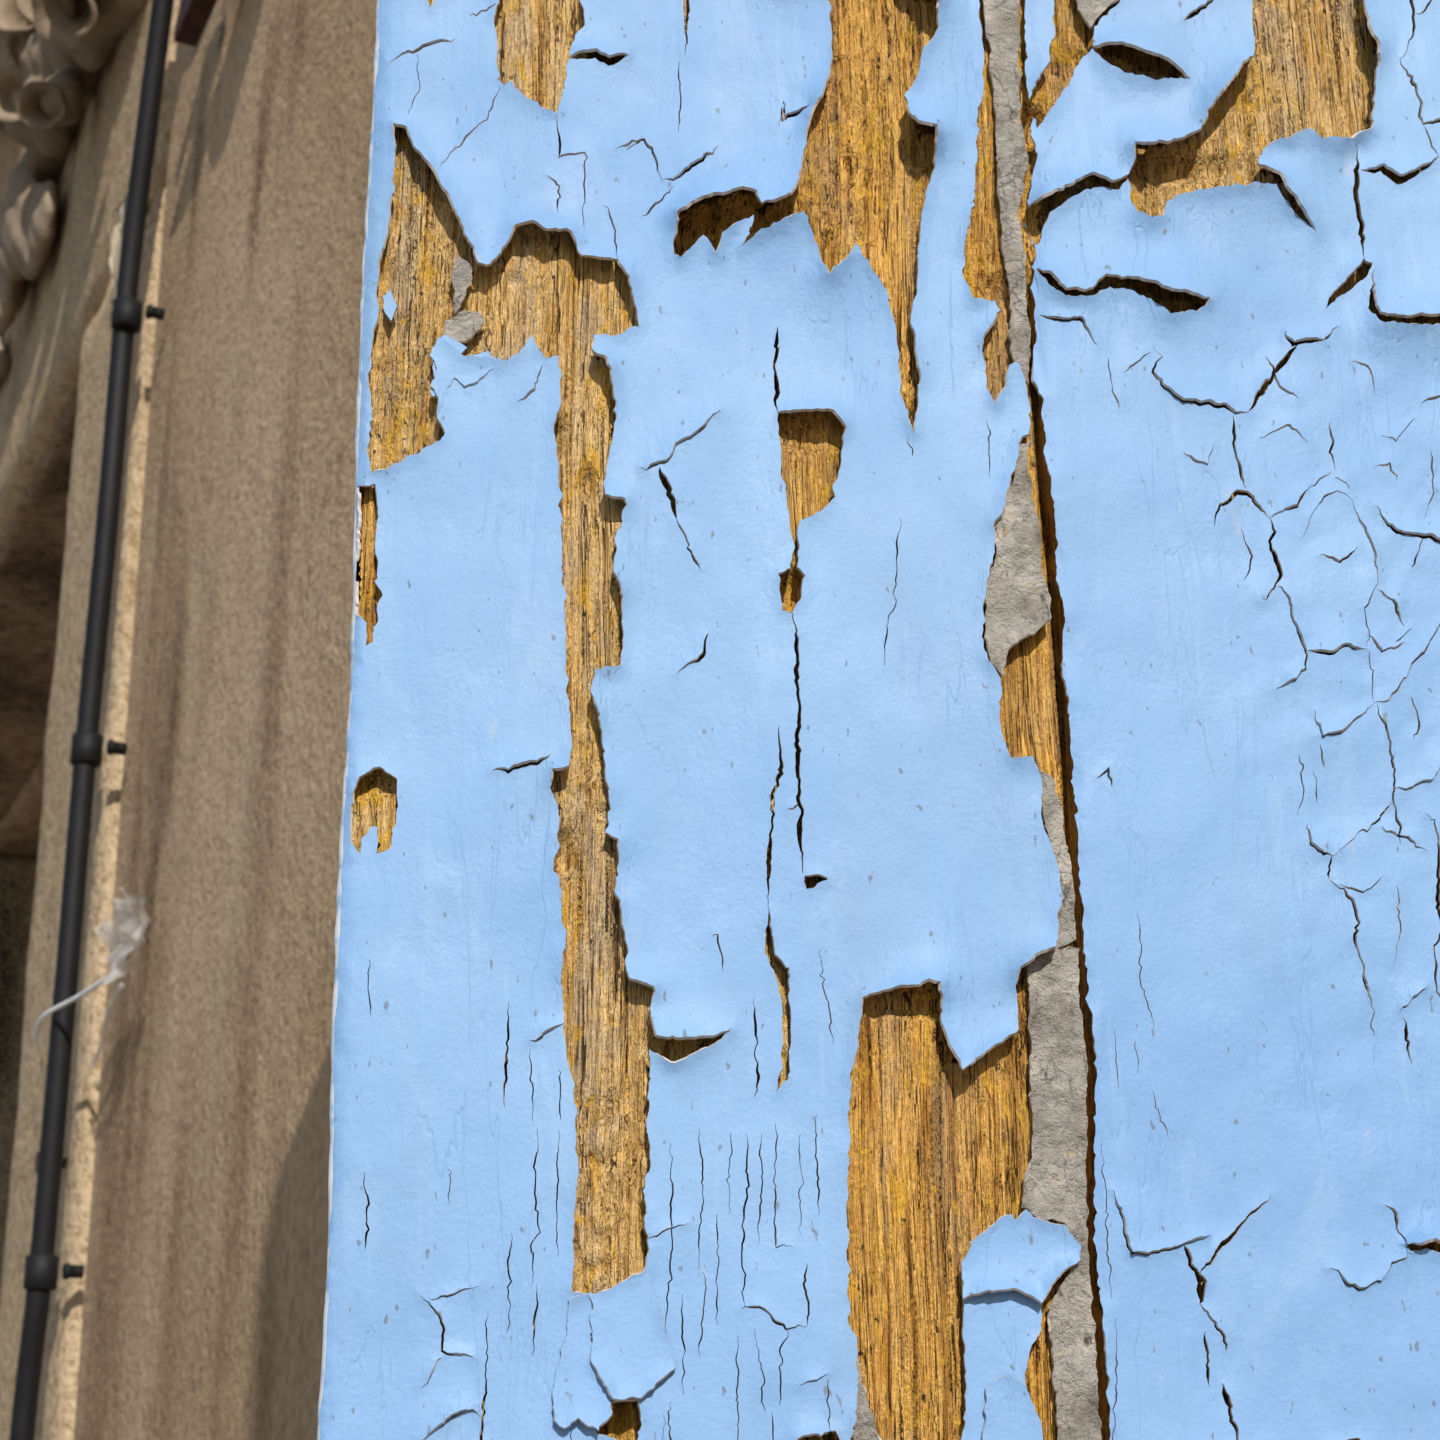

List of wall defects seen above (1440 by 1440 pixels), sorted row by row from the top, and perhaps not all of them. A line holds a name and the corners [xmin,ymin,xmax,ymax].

peeling [493,0,588,133]
crack [772,334,780,406]
crack [1127,326,1338,523]
peeling [1324,246,1440,372]
peeling [352,114,739,1440]
crack [766,632,803,898]
peeling [654,0,1397,1440]
crack [1244,447,1440,737]
crack [414,1007,561,1440]
crack [660,1117,820,1440]
crack [1105,1190,1265,1440]
peeling [1398,1197,1440,1269]